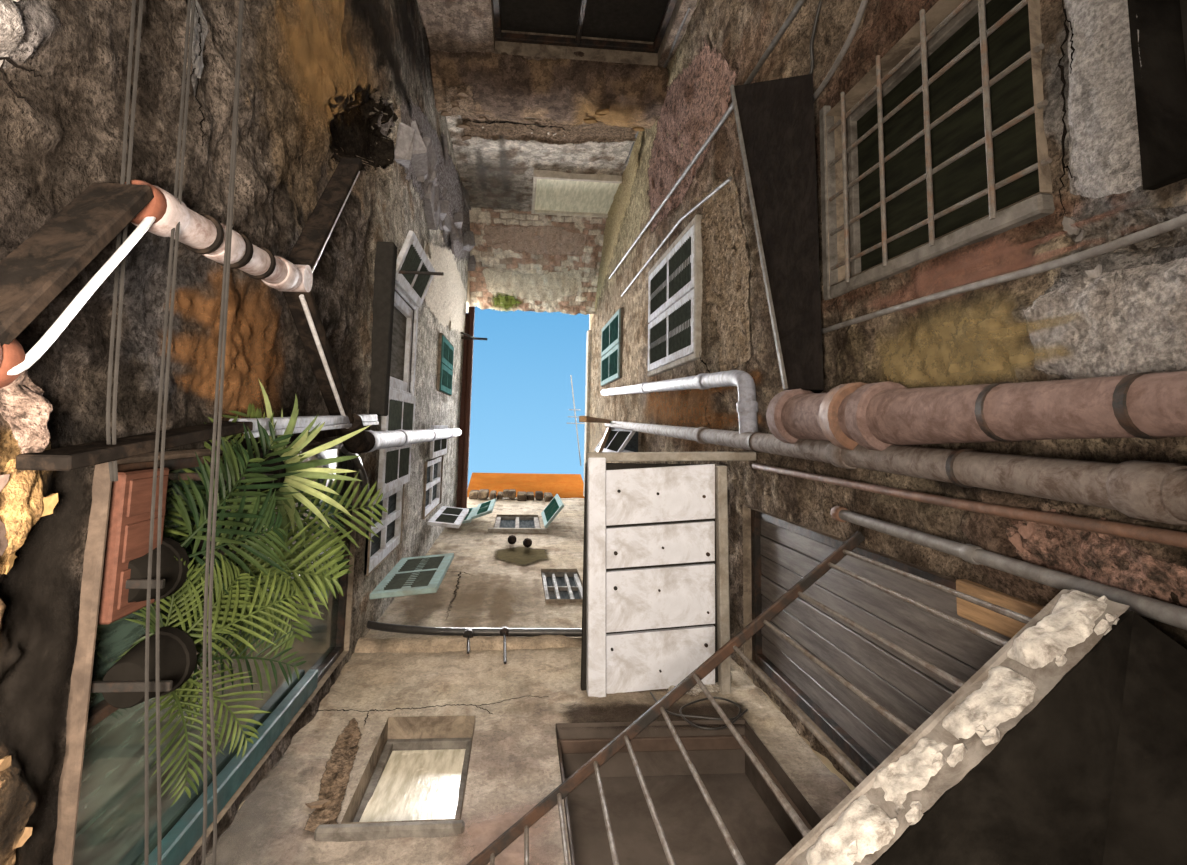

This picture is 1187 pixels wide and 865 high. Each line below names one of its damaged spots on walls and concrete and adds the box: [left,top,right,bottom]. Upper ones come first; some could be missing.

crack [0,57,42,111]
leakage [343,0,434,115]
spalling [327,38,739,335]
spalling [701,169,751,372]
peeling [1023,205,1187,379]
peeling [0,459,58,575]
leakage [495,546,549,565]
peeling [0,755,11,788]
spalling [304,718,362,833]
peeling [0,821,33,865]